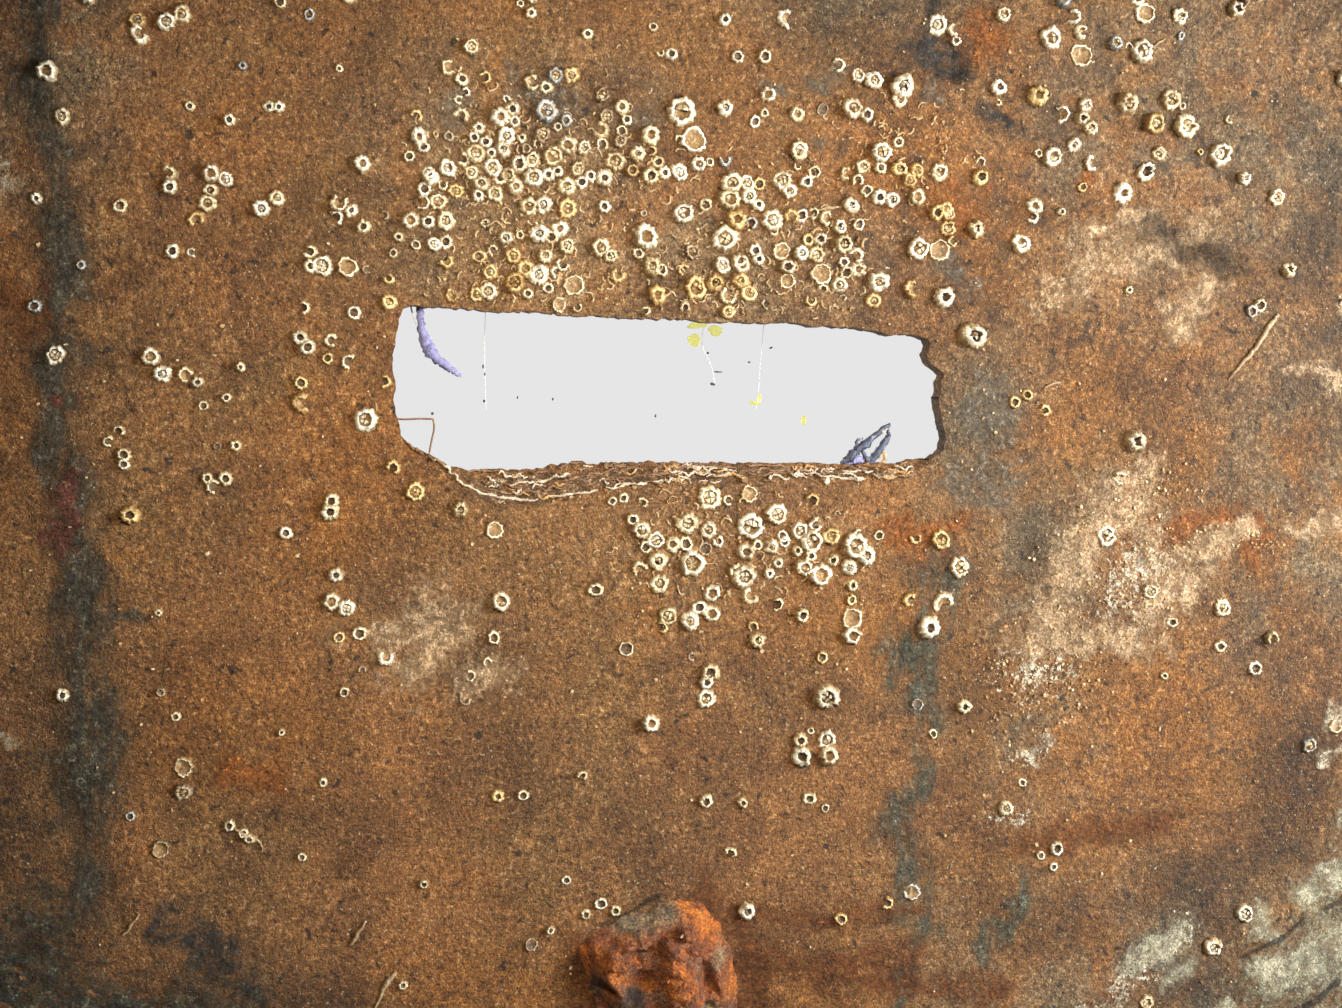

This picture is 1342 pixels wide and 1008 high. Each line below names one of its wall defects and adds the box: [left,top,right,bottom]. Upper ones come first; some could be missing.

damp [8,0,148,929]